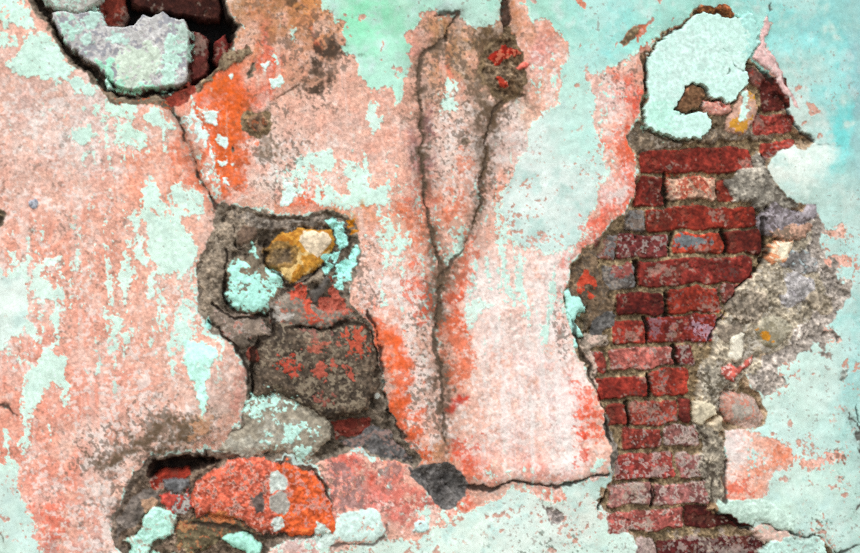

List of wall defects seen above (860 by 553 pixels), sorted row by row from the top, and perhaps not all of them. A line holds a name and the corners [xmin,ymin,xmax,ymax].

crack [499,0,513,32]
crack [416,9,508,447]
peeling [0,0,454,553]
spalling [314,0,859,553]
crack [852,405,860,454]
crack [467,472,611,494]
crack [786,530,860,553]